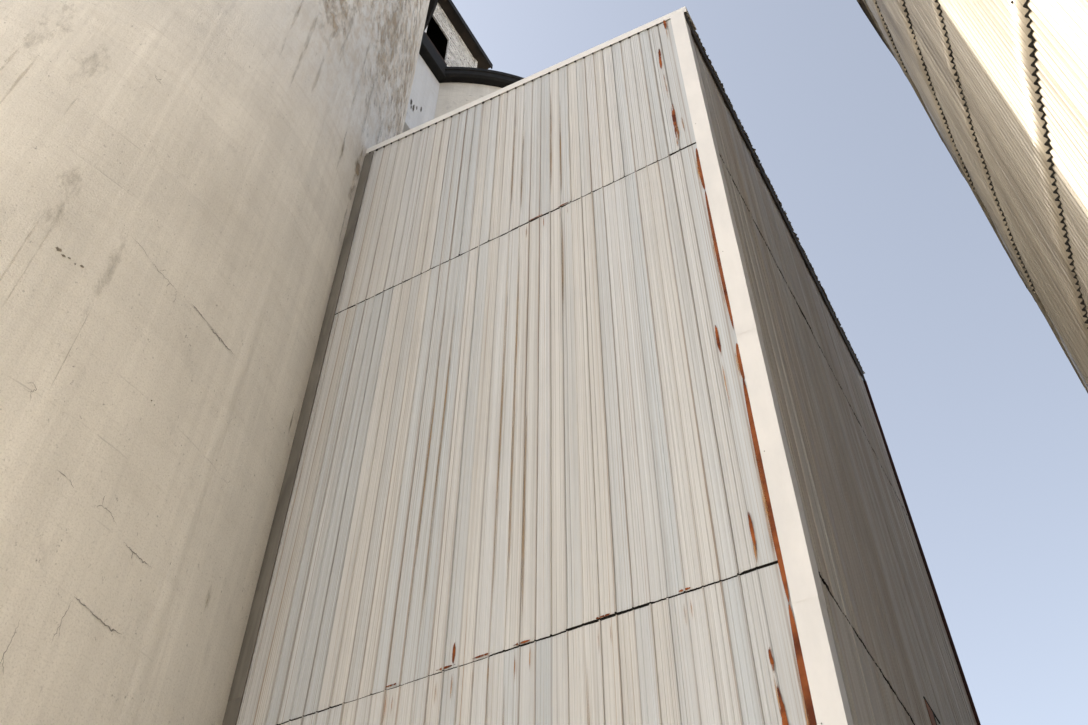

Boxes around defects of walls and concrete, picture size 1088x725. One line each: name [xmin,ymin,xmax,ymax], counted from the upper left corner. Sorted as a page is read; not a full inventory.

water stain [378,0,417,135]
rust [671,104,684,144]
rust [696,148,734,329]
rust [735,343,817,725]